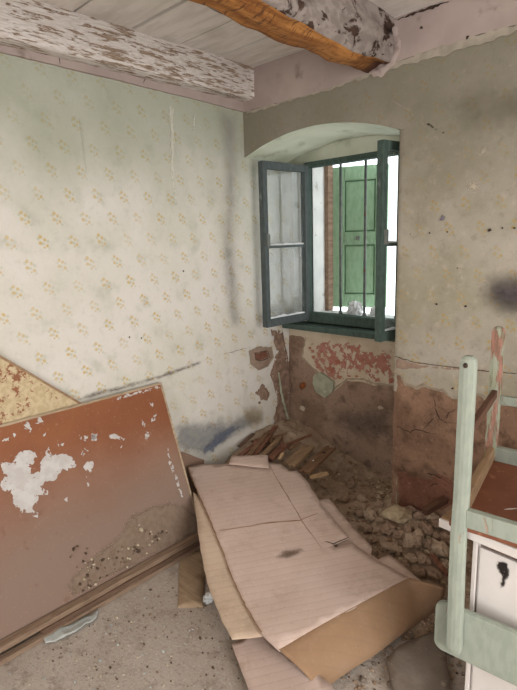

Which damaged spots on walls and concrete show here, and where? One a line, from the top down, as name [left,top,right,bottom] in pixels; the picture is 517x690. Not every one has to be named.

spalling [368,26,401,78]
water stain [492,281,517,308]
water stain [179,418,254,453]
spalling [249,329,459,518]
spalling [471,414,487,477]
spalling [475,394,486,413]
spalling [498,405,517,450]